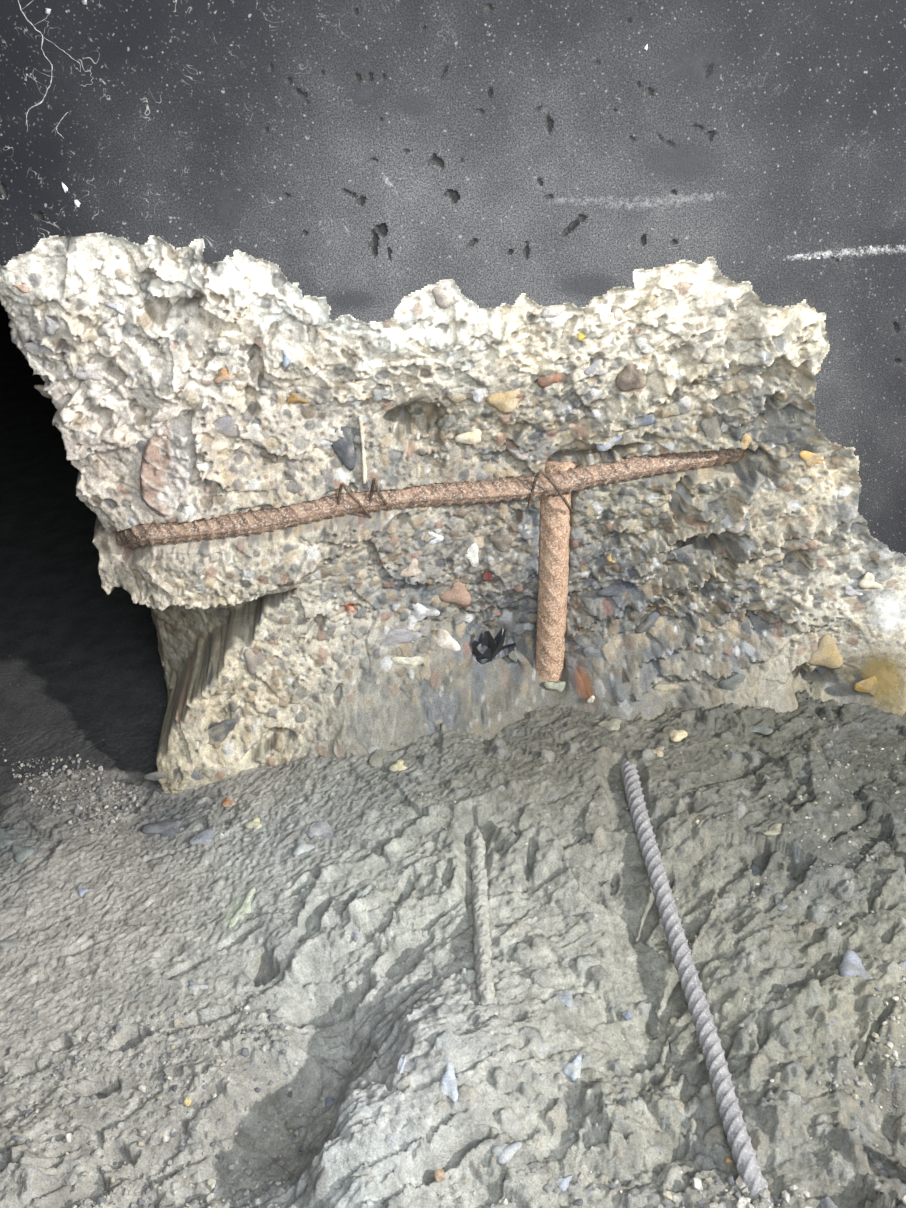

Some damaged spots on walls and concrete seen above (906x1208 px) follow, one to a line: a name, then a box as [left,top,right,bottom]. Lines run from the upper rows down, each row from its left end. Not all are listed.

spalling [561,214,588,237]
spalling [0,232,906,794]
spalling [0,690,906,1208]